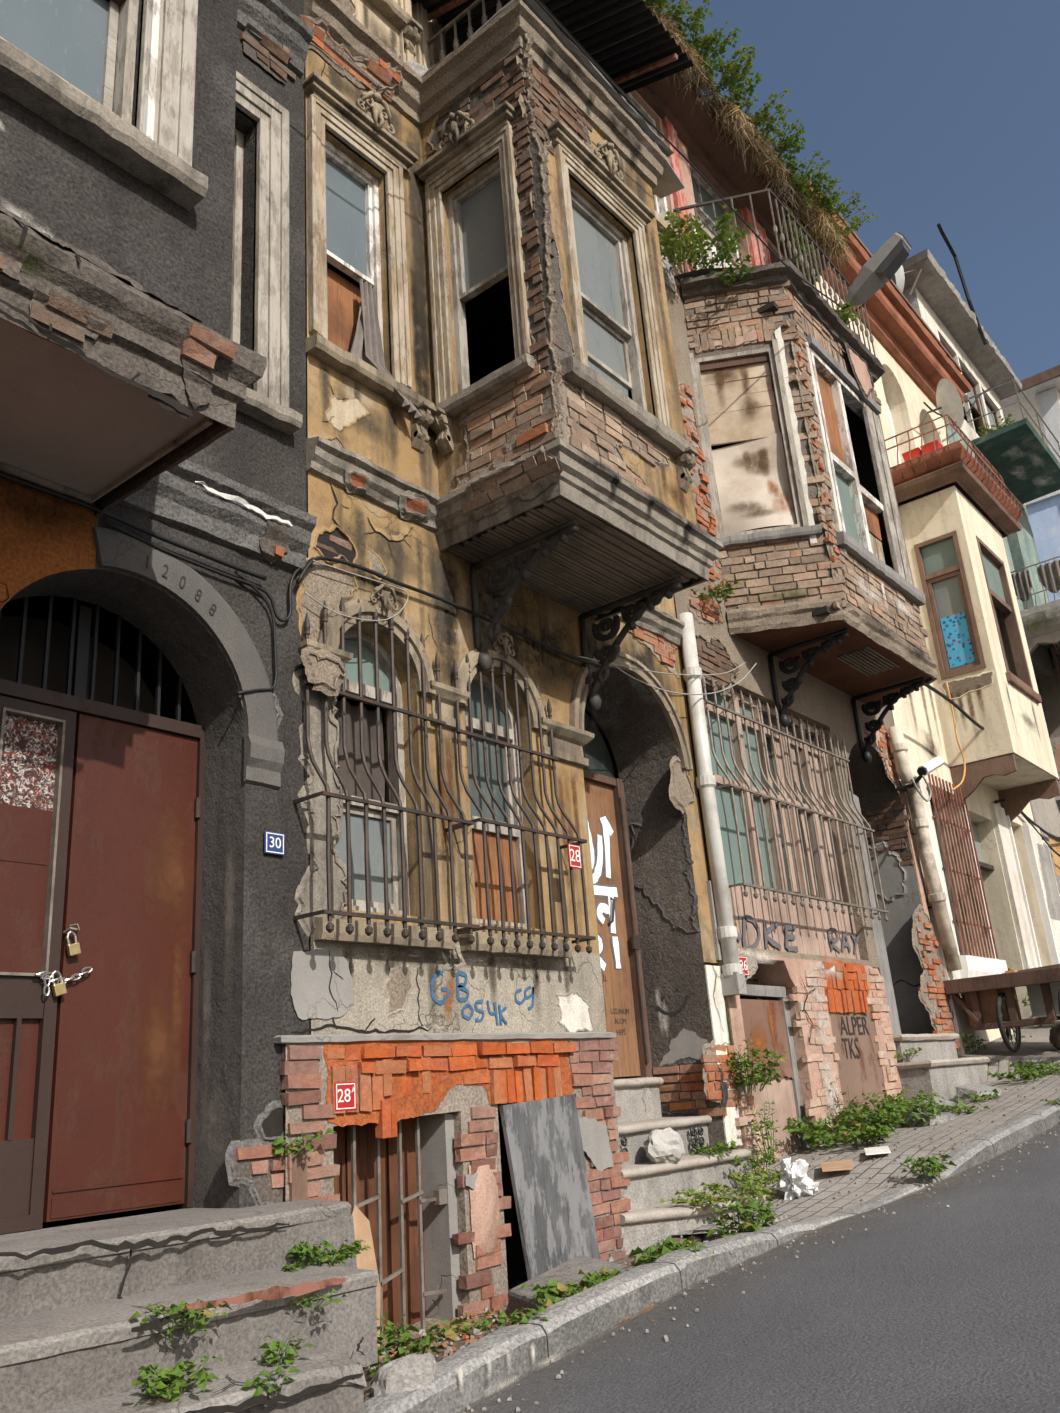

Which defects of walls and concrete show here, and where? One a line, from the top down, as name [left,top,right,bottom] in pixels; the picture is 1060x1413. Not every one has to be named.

flaking render [299,14,404,103]
spalling [0,238,115,344]
spalling [147,322,237,420]
peeling [313,392,382,494]
spalling [398,490,431,524]
spalling [273,693,284,728]
spalling [292,524,389,937]
flaking render [868,841,961,1052]
spalling [324,989,595,1139]
crack [0,1222,290,1332]